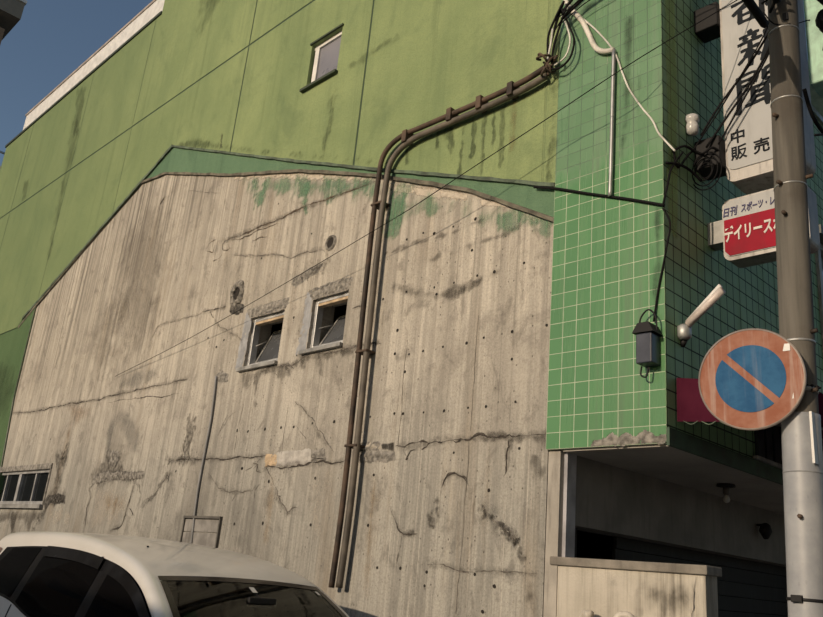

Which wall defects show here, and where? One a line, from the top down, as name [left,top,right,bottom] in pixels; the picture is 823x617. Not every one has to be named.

peeling [234,173,373,182]
peeling [389,184,468,201]
spalling [230,280,251,370]
crack [16,379,184,413]
crack [396,315,544,503]
crack [114,402,342,530]
peeling [265,448,326,467]
spalling [359,441,396,464]
spalling [591,430,666,447]
crack [428,526,532,609]